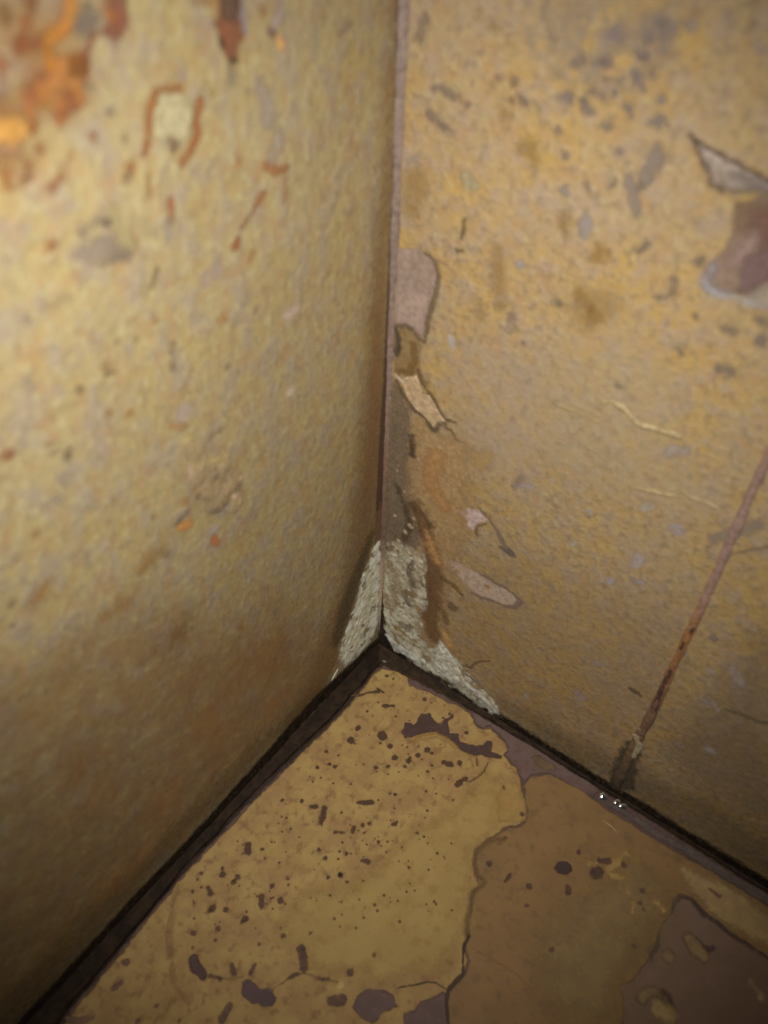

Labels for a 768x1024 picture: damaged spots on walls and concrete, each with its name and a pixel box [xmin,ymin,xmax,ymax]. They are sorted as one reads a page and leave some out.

corrosion [211,0,247,63]
corrosion [0,0,129,190]
spalling [689,134,768,307]
spalling [395,248,441,343]
peeling [395,370,455,435]
spalling [461,508,516,558]
damp [57,175,768,1024]
spalling [446,557,522,609]